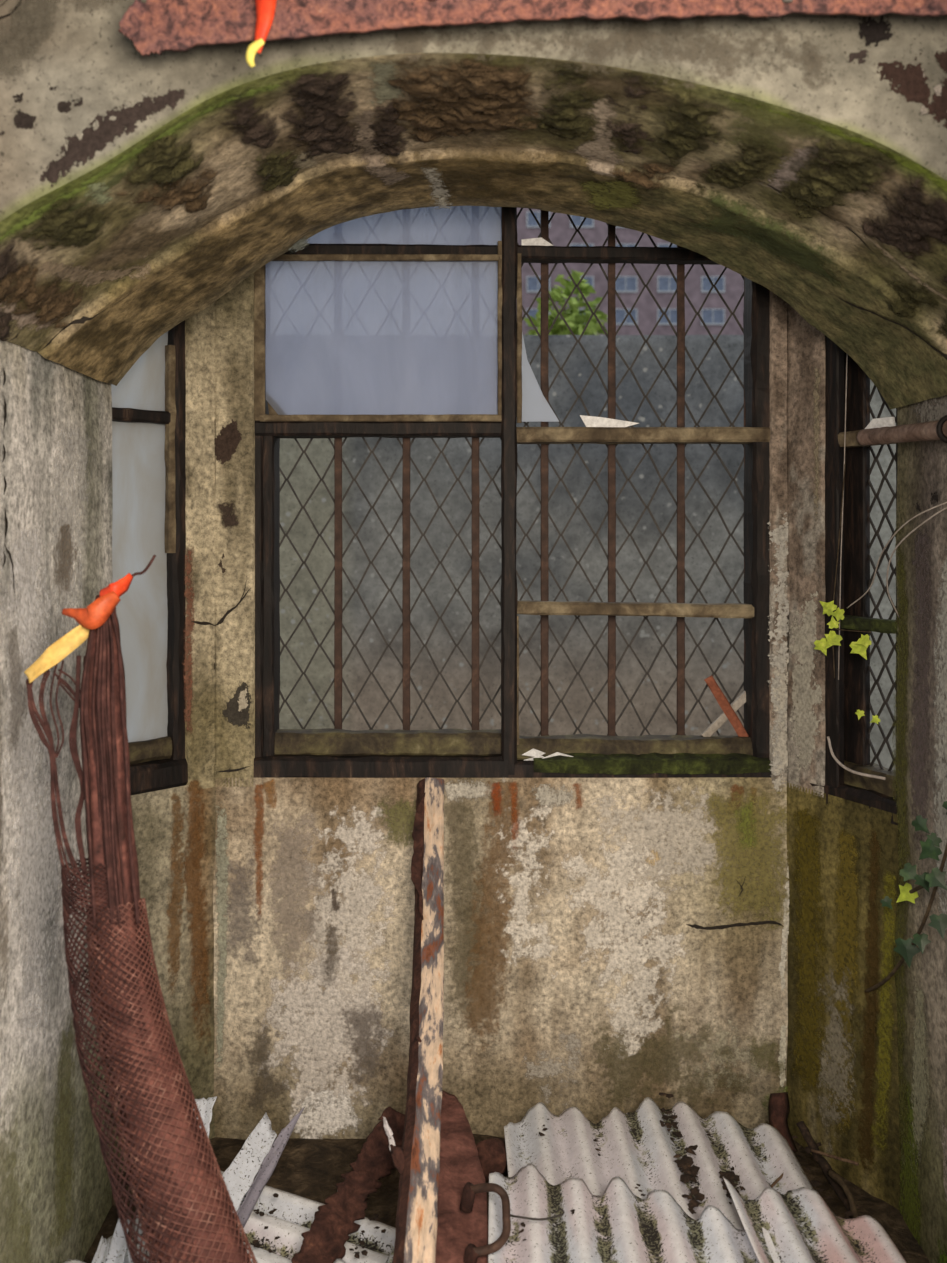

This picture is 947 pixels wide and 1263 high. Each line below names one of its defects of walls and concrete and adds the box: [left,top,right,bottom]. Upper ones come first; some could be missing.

peeling [0,86,185,341]
leakage [350,27,452,209]
spalling [221,58,947,261]
leakage [568,99,624,177]
peeling [845,15,947,127]
peeling [214,419,242,465]
crack [192,580,250,626]
rust [167,780,210,1035]
rust [254,779,276,914]
rust [411,792,426,920]
rust [466,782,518,1035]
leakage [792,528,947,1245]